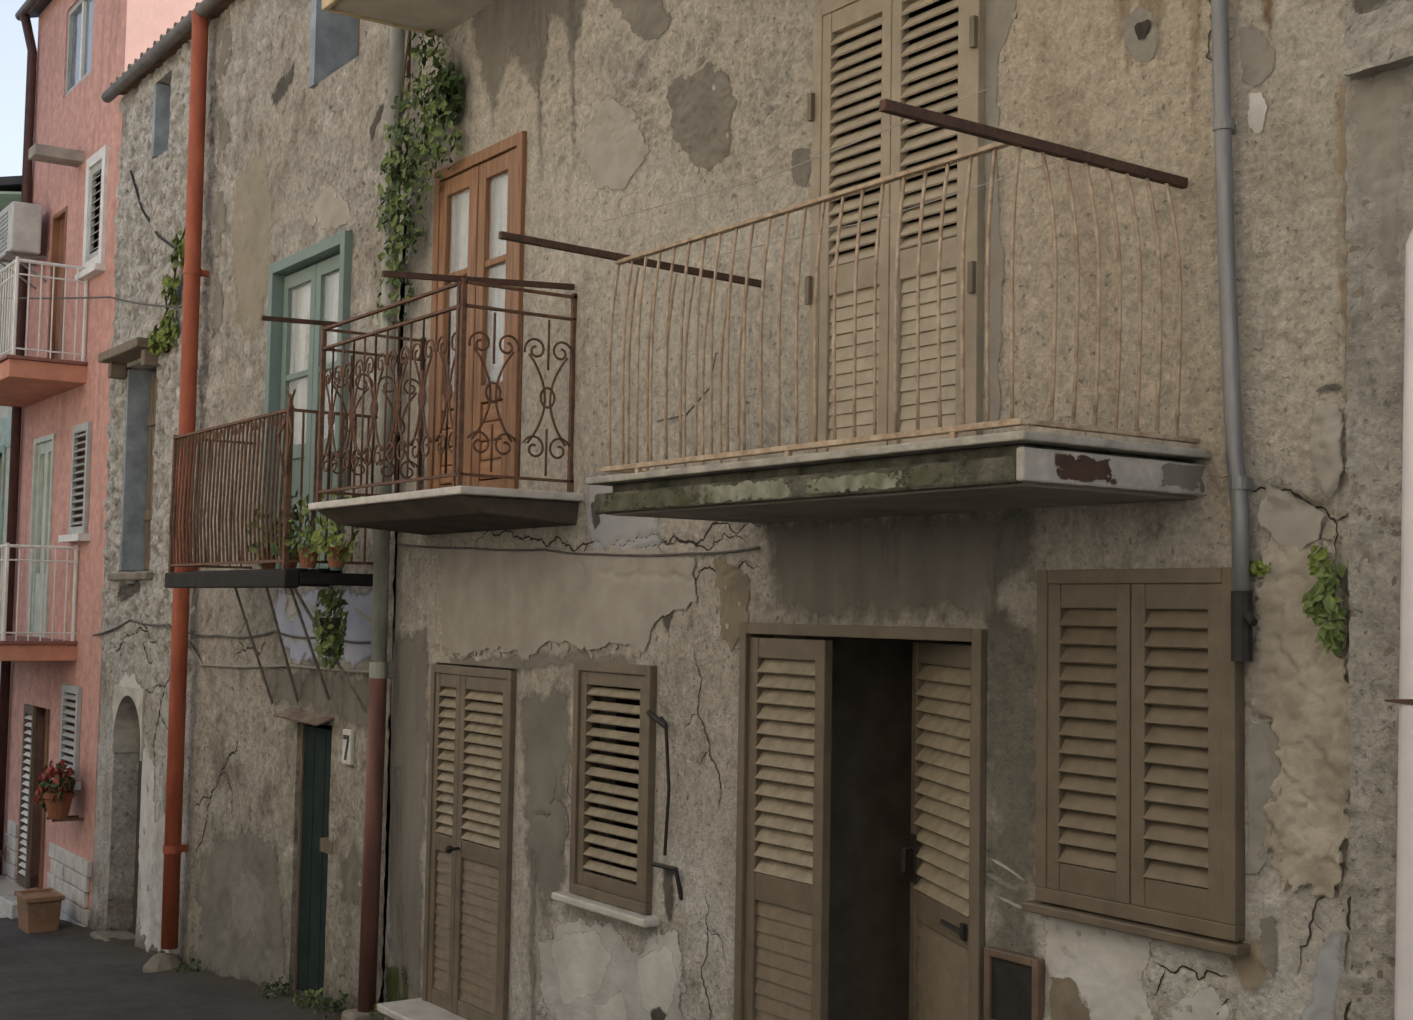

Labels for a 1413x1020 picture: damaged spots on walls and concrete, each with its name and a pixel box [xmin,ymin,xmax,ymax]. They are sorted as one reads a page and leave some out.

flaking render [438,544,697,661]
flaking render [591,502,600,529]
crack [468,521,762,580]
flaking render [713,557,750,652]
corrosion [1055,454,1117,484]
crack [684,651,722,803]
peeling [537,917,686,1020]
crack [701,897,725,1020]
peeling [1040,916,1230,1020]
crack [1297,864,1353,1020]